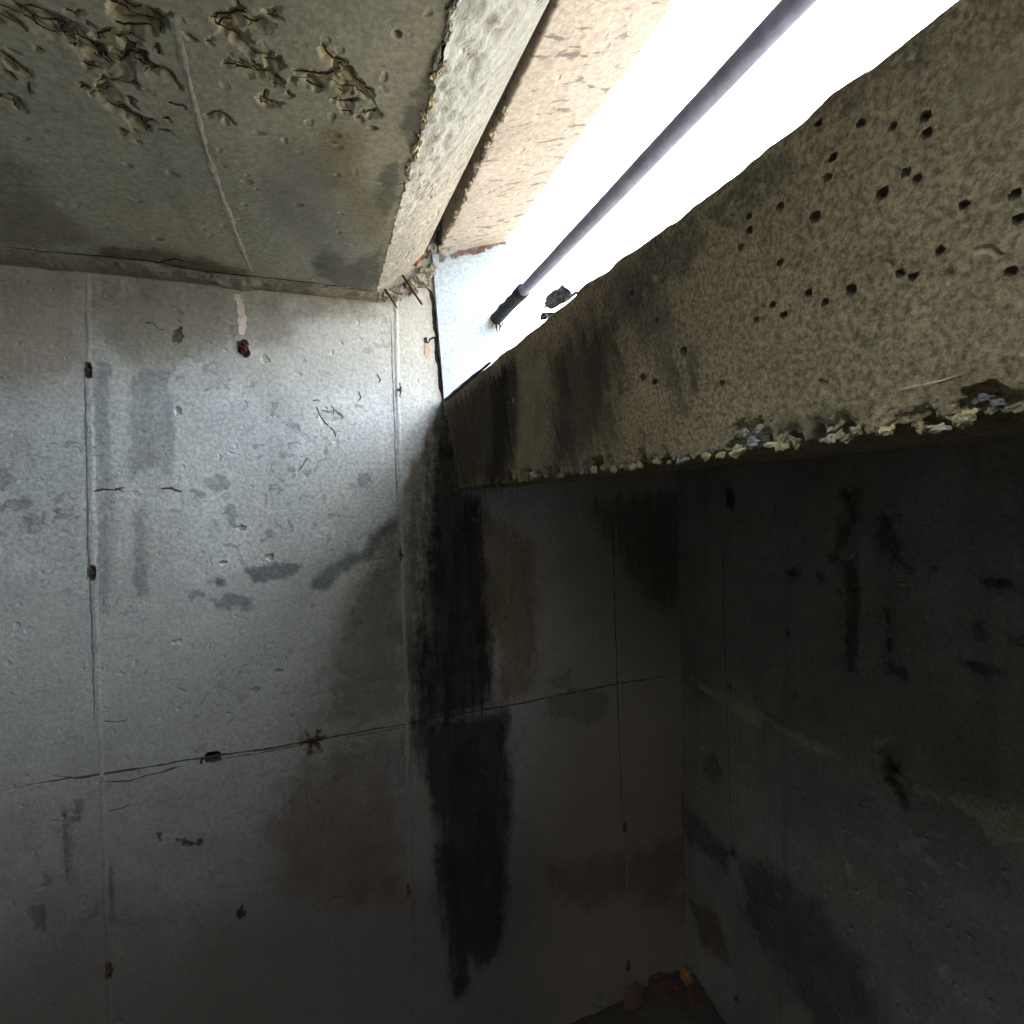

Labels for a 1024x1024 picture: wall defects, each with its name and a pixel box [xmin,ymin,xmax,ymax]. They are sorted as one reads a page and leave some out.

spalling [0,0,386,146]
spalling [376,0,459,287]
corrosion [237,339,251,358]
spalling [481,410,801,487]
spalling [819,424,896,444]
spalling [911,378,1024,434]
water stain [245,562,299,582]
water stain [312,522,396,589]
water stain [411,359,519,997]
corrosion [300,730,326,755]
crack [1,673,676,811]